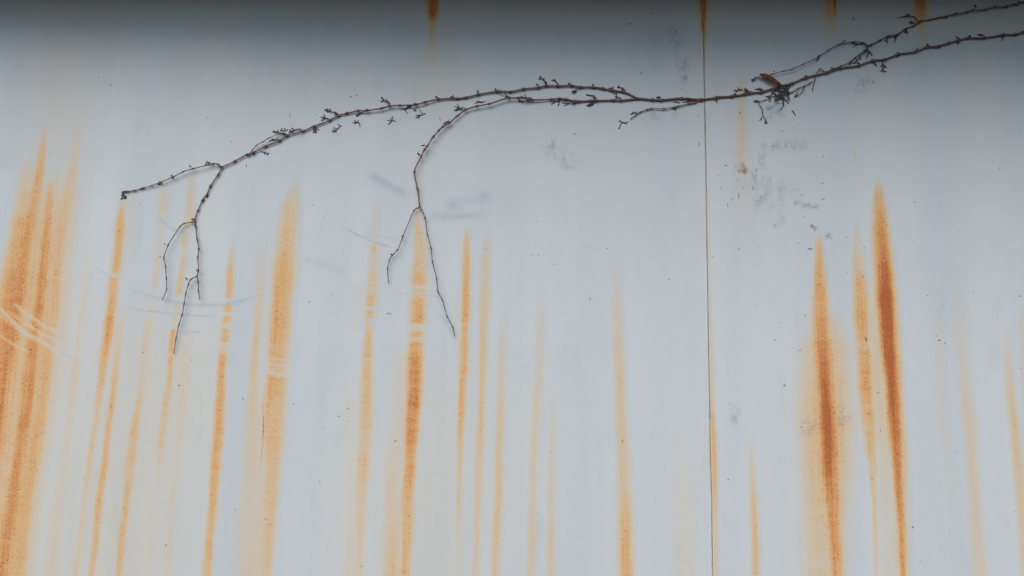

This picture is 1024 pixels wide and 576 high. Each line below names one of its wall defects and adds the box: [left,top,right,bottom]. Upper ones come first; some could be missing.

rust [893,0,934,80]
rust [0,0,593,576]
rust [784,175,915,576]